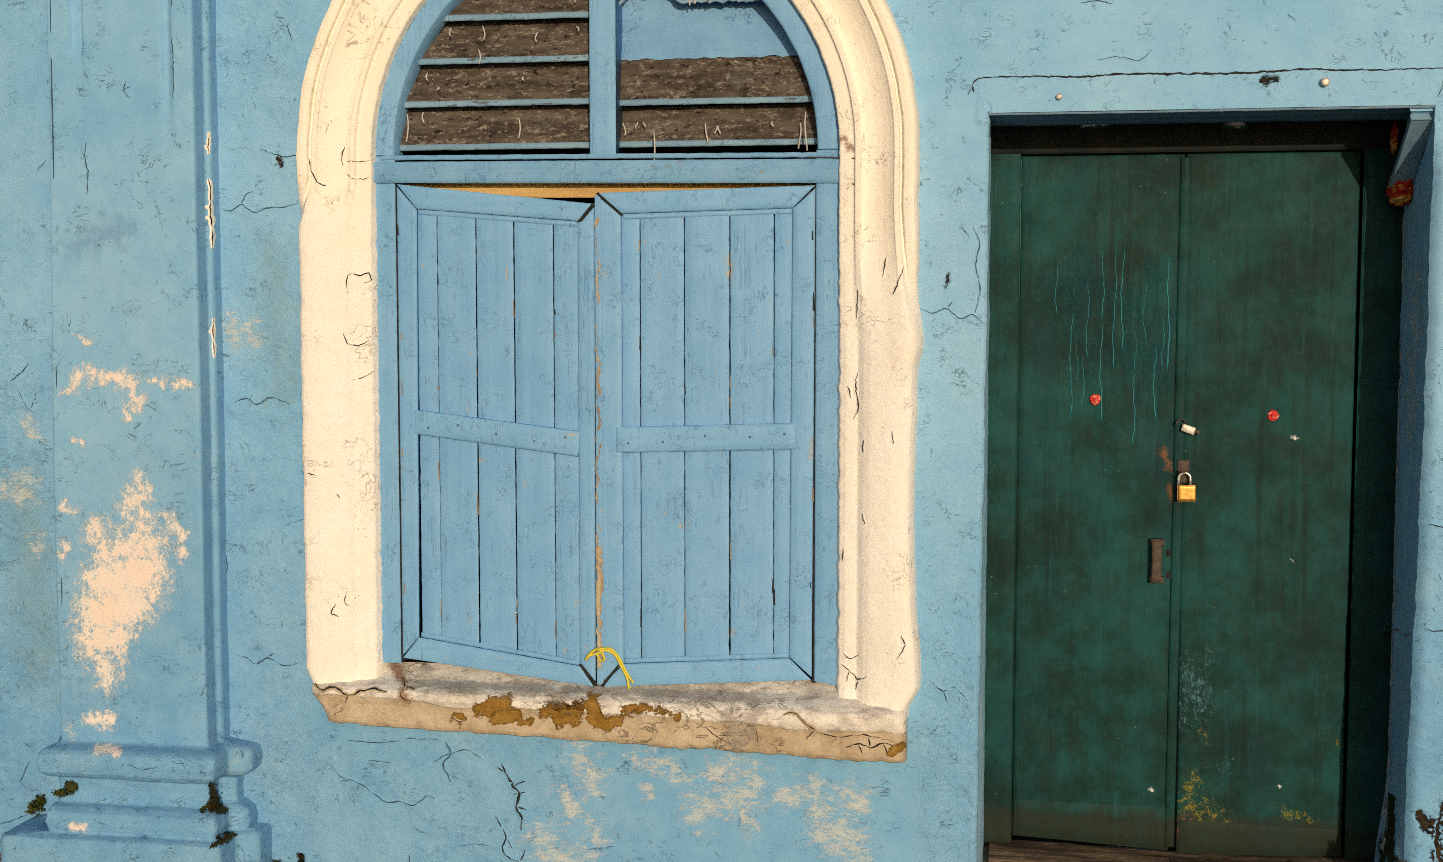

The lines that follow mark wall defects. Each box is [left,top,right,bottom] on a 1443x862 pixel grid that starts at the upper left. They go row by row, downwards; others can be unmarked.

peeling [58,333,197,423]
crack [1428,522,1443,530]
peeling [56,466,190,758]
crack [1392,625,1443,640]
spalling [449,691,683,733]
crack [236,652,529,862]
crack [1428,806,1443,862]